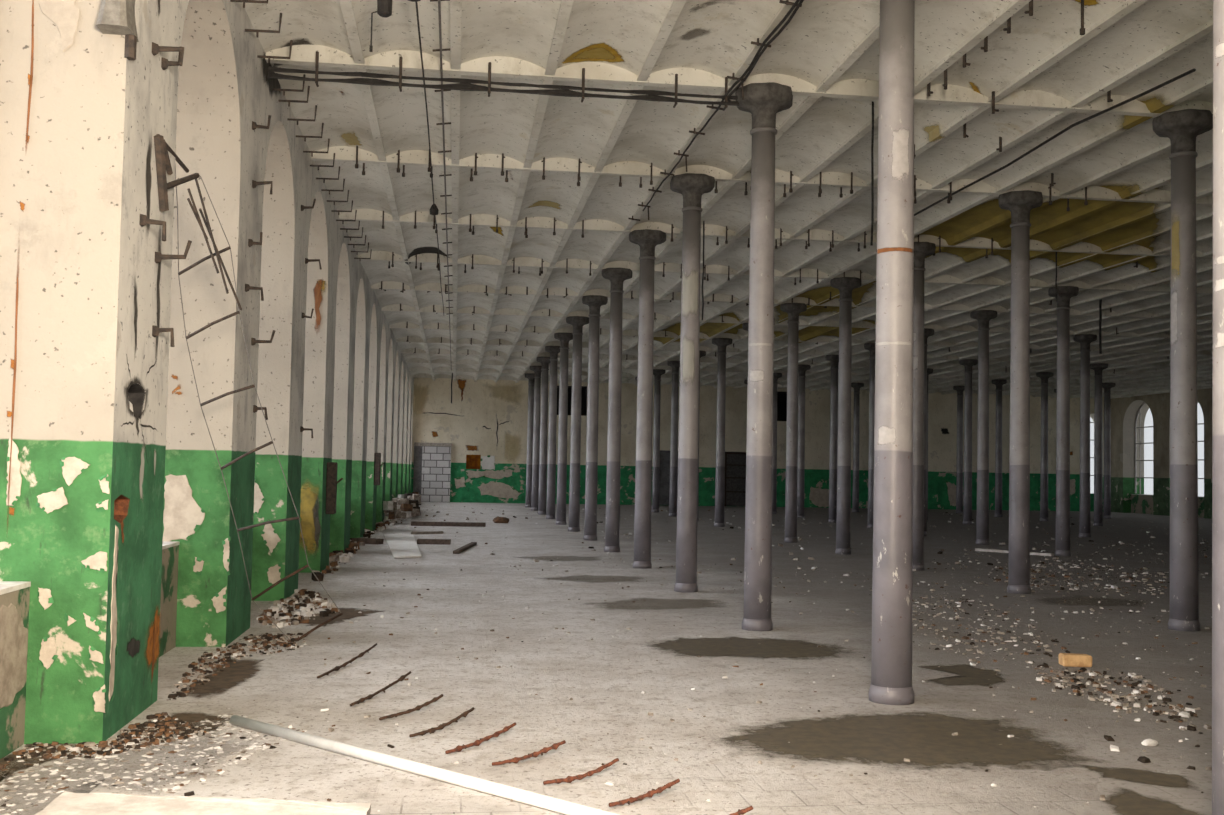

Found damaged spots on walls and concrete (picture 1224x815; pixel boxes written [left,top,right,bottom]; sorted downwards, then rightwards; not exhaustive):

hole [125,377,148,435]
peeling [6,438,22,506]
peeling [36,457,89,514]
peeling [163,474,206,542]
water stain [300,485,321,551]
peeling [37,587,54,610]
peeling [65,474,130,713]
peeling [211,537,230,613]
peeling [0,603,59,711]
corrosion [126,609,160,679]
water stain [648,637,849,659]
water stain [722,712,1200,815]